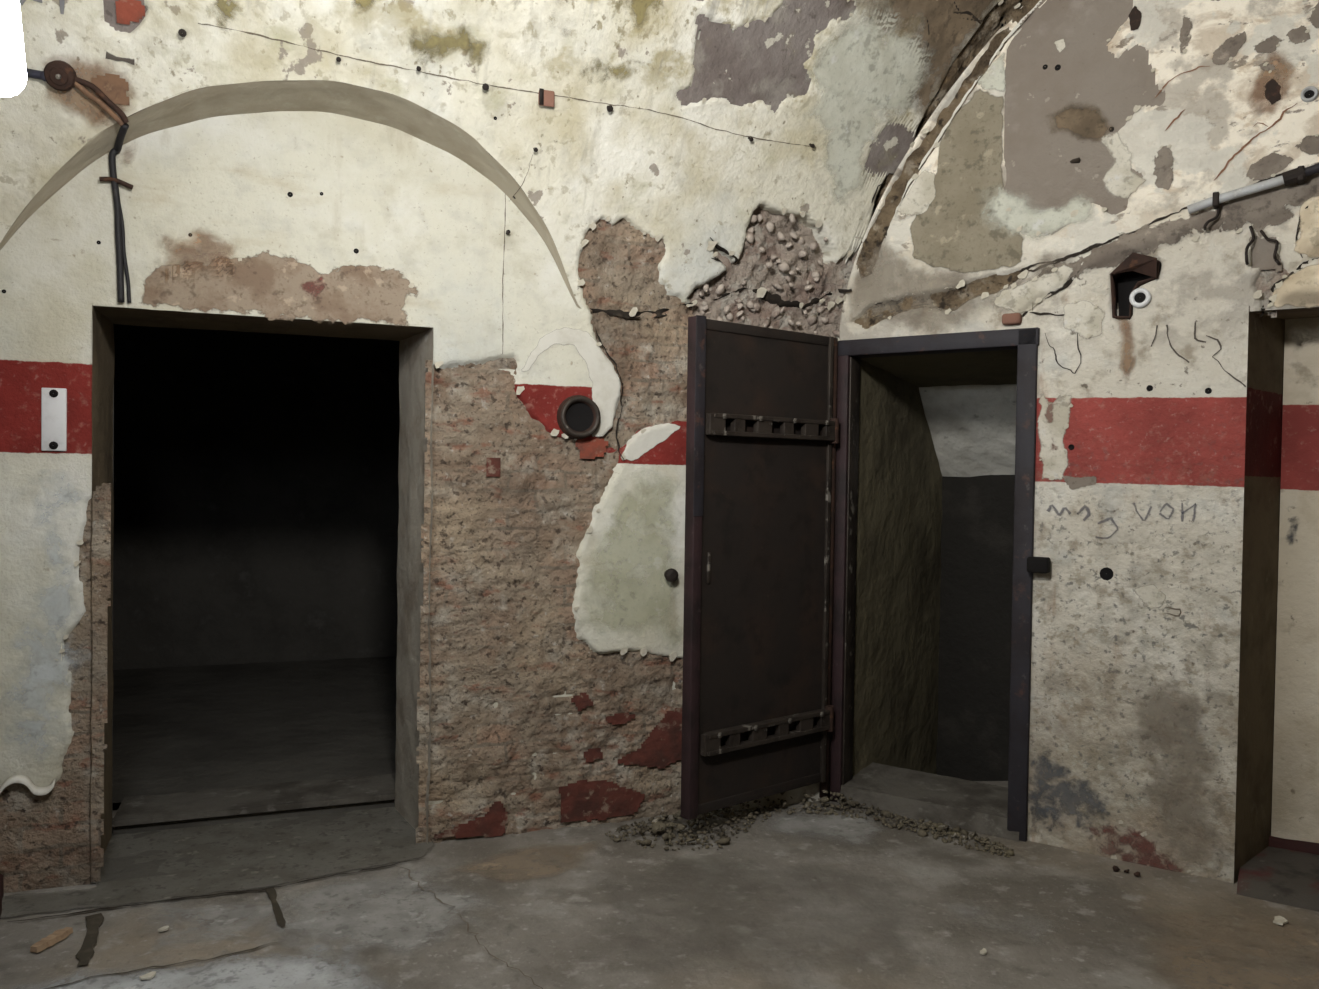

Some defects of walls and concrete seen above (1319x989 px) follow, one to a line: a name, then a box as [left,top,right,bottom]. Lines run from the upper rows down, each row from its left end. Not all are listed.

crack [920,1,982,97]
crack [867,175,887,228]
flaking render [142,248,418,326]
crack [873,299,903,318]
crack [1013,206,1187,374]
flaking render [416,0,1319,843]
flaking render [0,483,111,893]
damp [1028,756,1105,828]
damp [1143,685,1209,833]